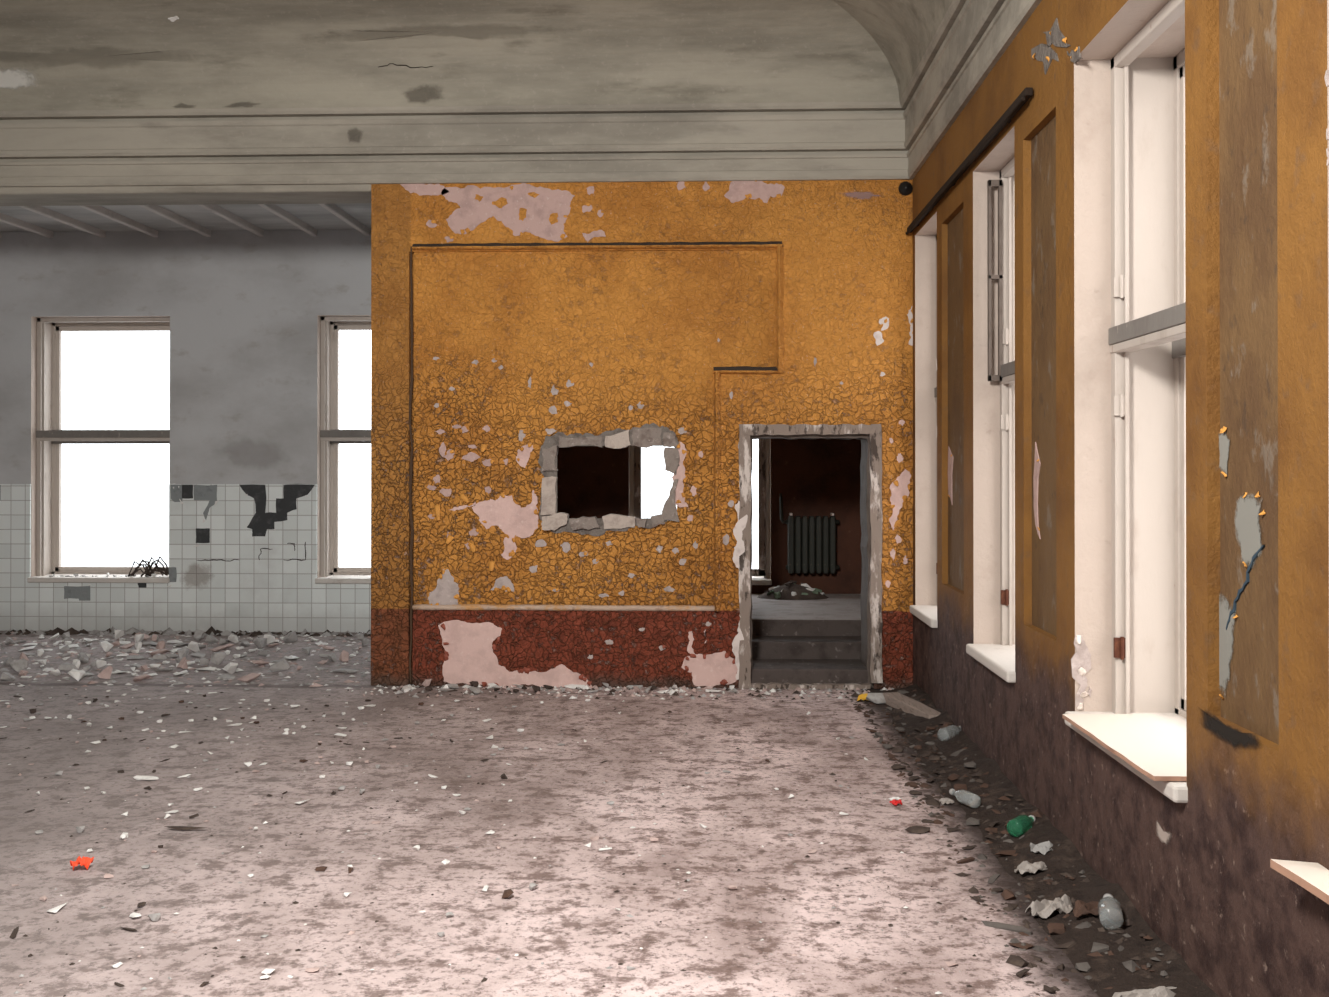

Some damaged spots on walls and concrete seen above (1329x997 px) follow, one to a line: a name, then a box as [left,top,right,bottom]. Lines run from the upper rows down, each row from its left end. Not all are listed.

peeling [400,183,606,243]
peeling [724,181,785,203]
peeling [873,317,889,346]
peeling [240,484,314,536]
spalling [427,379,704,592]
peeling [889,420,911,564]
peeling [1219,426,1229,478]
peeling [1235,491,1266,568]
peeling [428,569,593,688]
peeling [682,615,744,686]